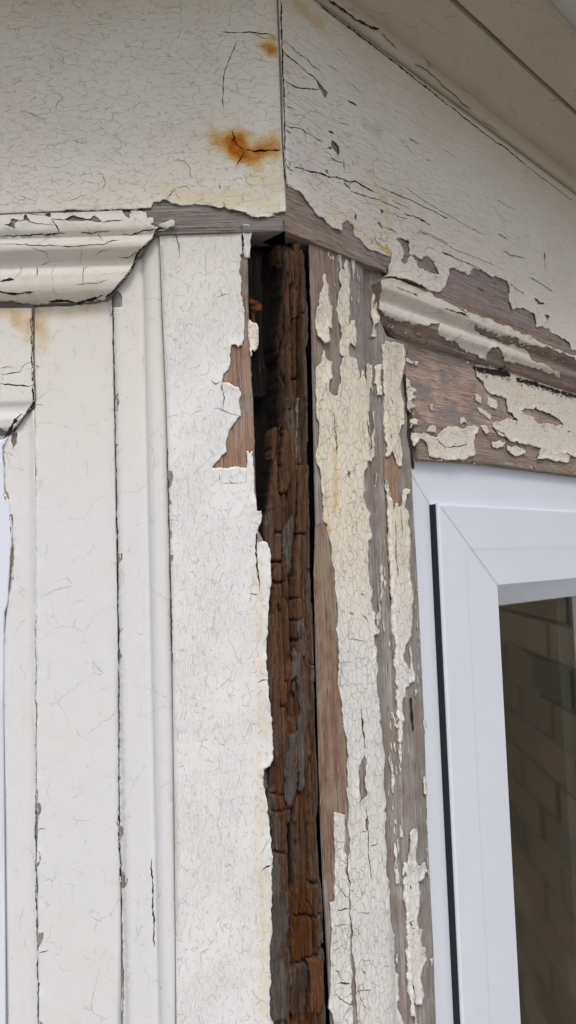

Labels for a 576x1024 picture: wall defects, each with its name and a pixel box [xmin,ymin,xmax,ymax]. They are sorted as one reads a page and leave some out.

peeling [112,291,122,308]
crack [222,0,572,305]
crack [249,527,260,603]
peeling [123,184,576,1024]